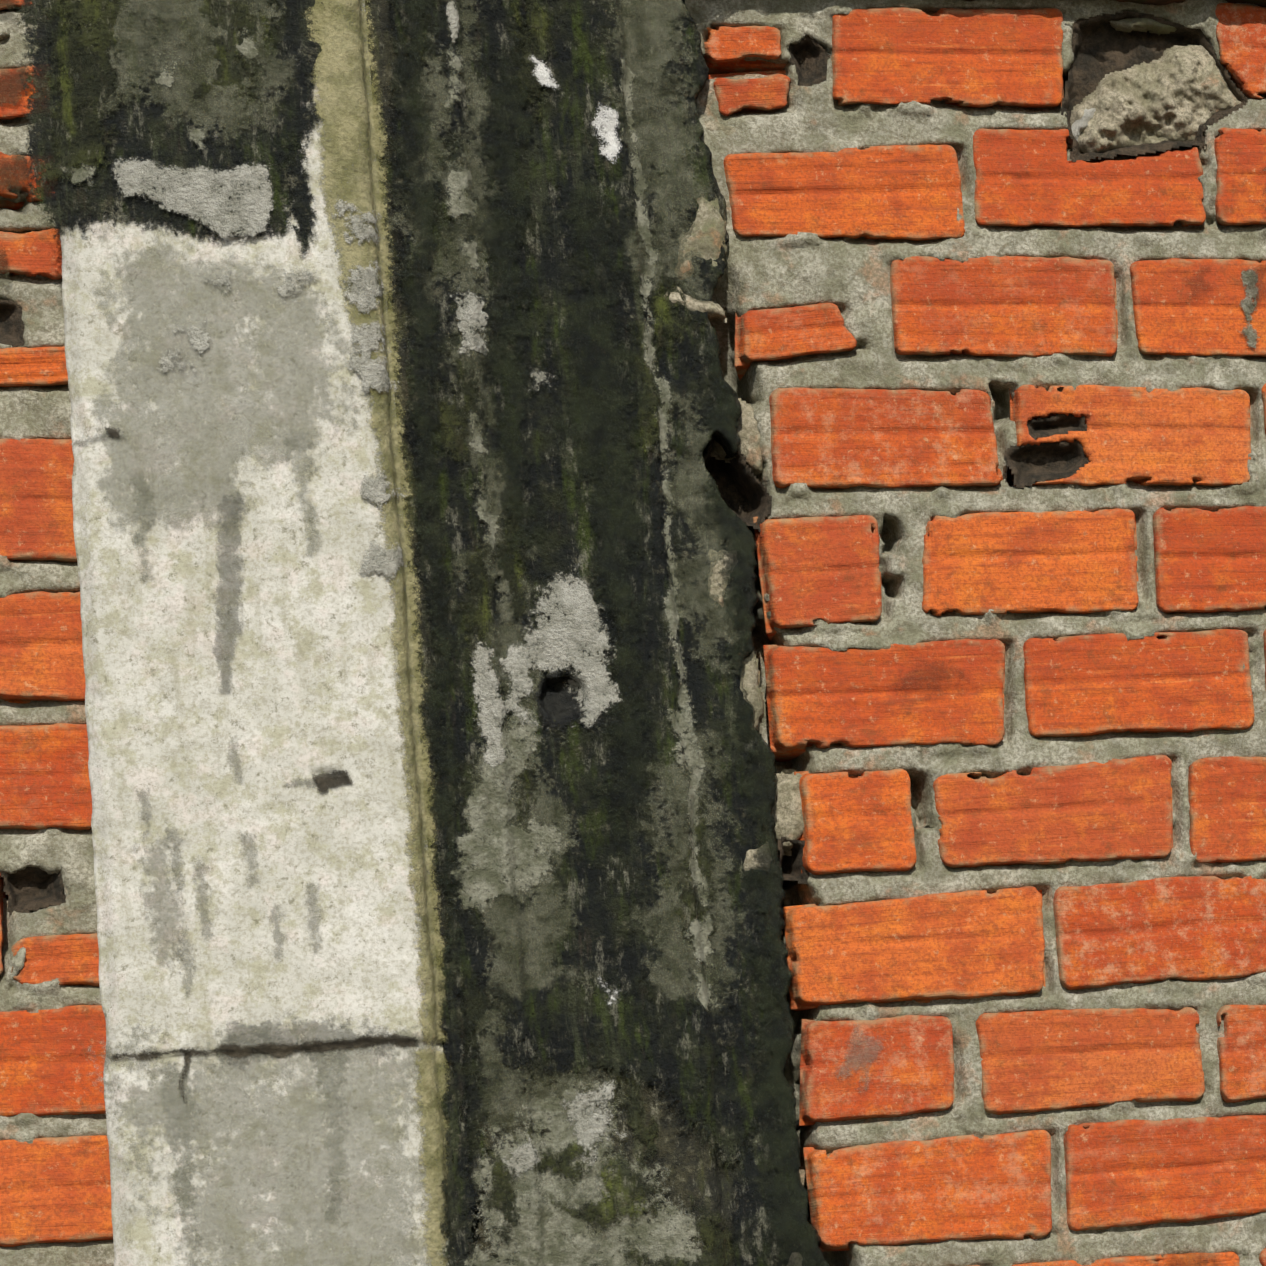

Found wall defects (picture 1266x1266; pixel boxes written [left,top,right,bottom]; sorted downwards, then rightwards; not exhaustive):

spalling [1061,11,1248,162]
damp [157,321,211,374]
spalling [1004,414,1089,488]
damp [385,0,830,1266]
crack [112,1030,475,1103]